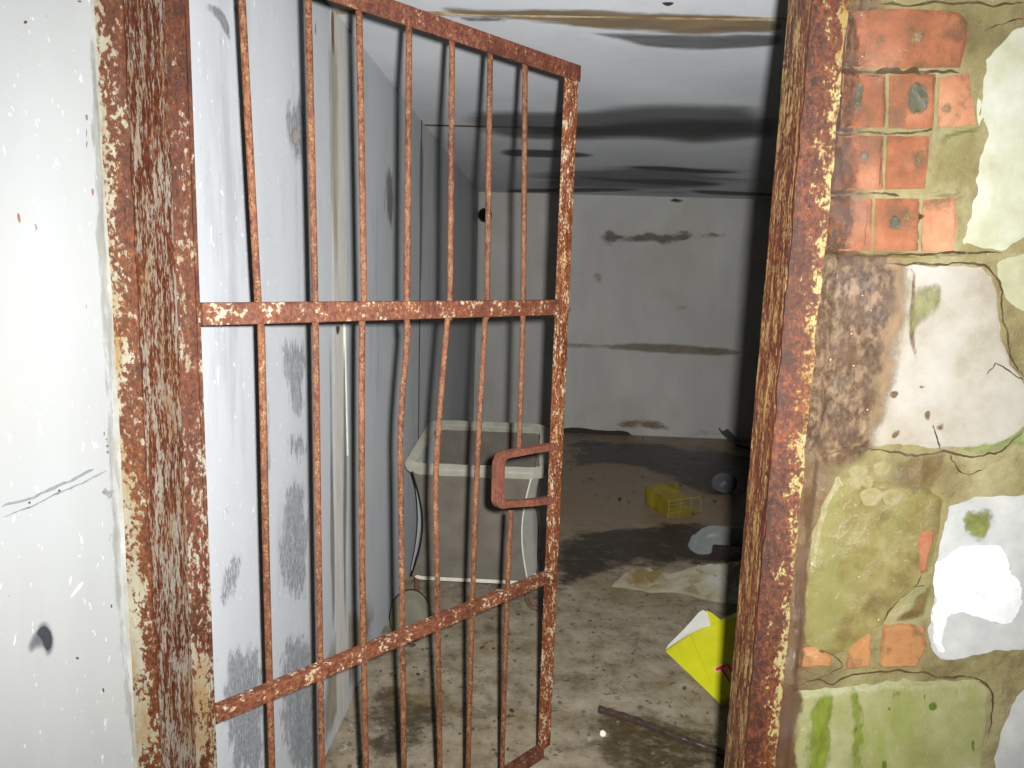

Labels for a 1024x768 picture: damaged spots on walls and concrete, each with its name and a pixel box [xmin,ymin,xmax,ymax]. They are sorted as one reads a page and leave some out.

damp [482,114,563,157]
damp [576,108,765,141]
spalling [826,9,976,251]
damp [574,167,772,196]
damp [605,231,689,243]
crack [826,425,1023,475]
crack [2,469,106,517]
rust [793,483,816,677]
peeling [845,495,1024,669]
damp [810,696,832,768]
damp [852,690,863,763]
crack [800,650,994,737]